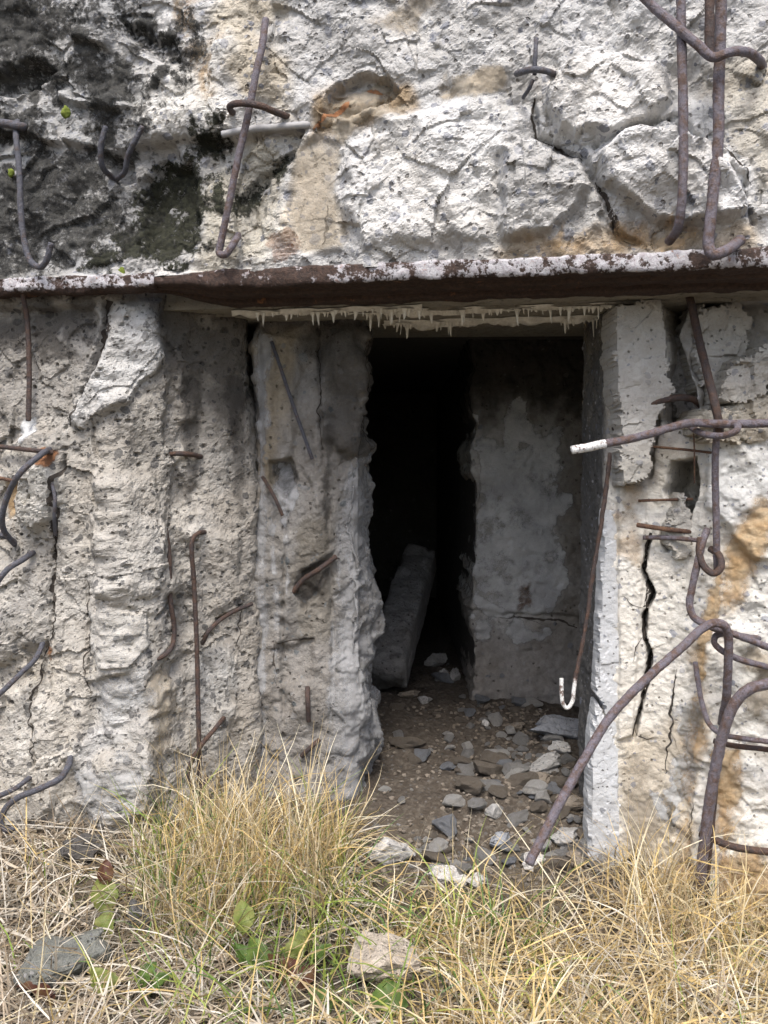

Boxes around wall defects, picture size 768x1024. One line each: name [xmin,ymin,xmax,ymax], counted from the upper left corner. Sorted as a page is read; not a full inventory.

damp [27,86,42,117]
damp [145,65,171,104]
spalling [313,79,397,129]
crack [530,98,582,160]
crack [595,182,633,245]
damp [231,302,616,695]
spalling [297,559,329,600]
corrosion [696,498,768,680]
crack [623,533,679,774]
corrosion [744,647,768,716]
corrosion [685,694,768,921]